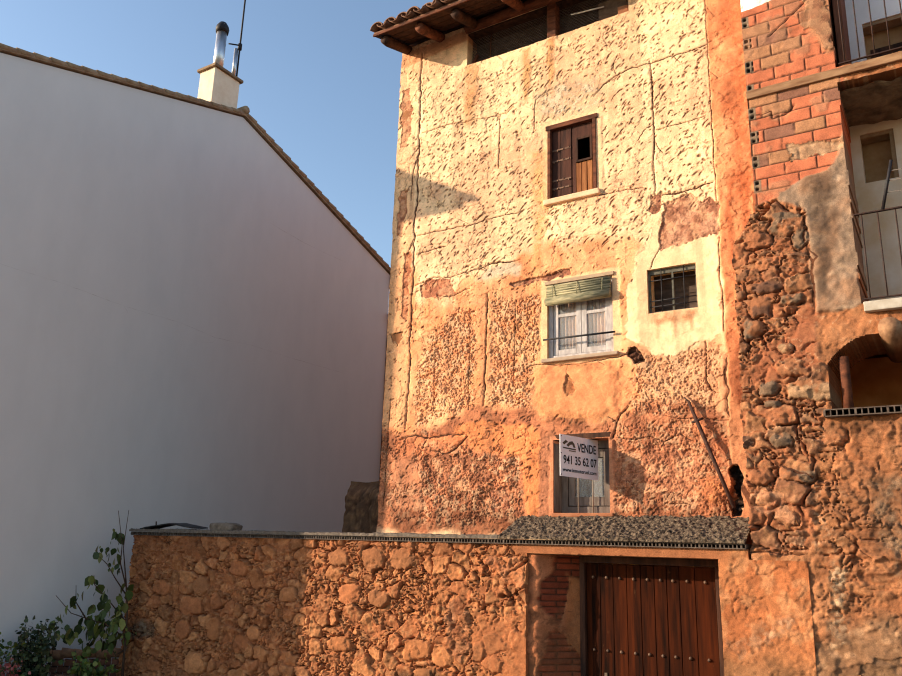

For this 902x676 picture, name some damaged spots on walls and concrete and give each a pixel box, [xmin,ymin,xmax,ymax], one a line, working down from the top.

flaking render [799,0,833,50]
flaking render [786,140,844,162]
flaking render [649,193,720,251]
crack [383,56,552,506]
flaking render [510,269,571,287]
crack [717,239,725,327]
spalling [626,347,645,364]
crack [609,343,730,447]
flaking render [859,657,902,676]